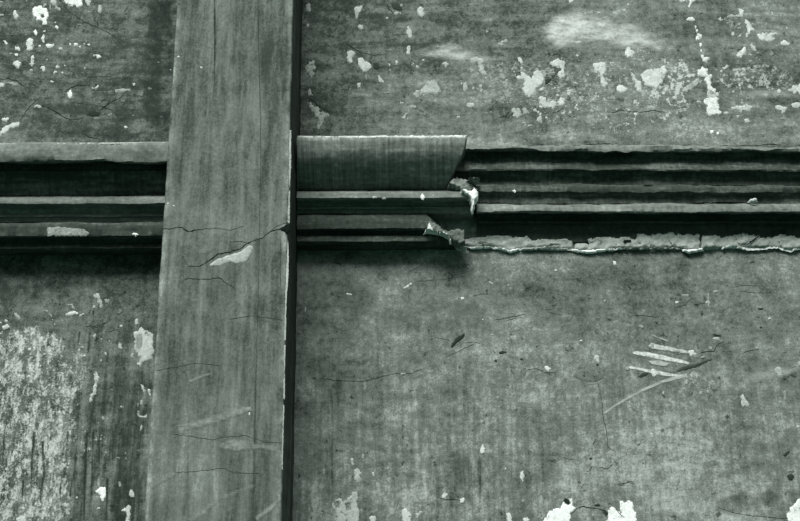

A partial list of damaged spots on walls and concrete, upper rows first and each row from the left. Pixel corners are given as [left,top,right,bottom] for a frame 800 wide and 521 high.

peeling [3,0,101,83]
crack [1,78,23,86]
crack [20,76,122,139]
crack [255,13,263,189]
peeling [503,57,578,127]
flaking render [447,177,480,214]
crack [161,210,288,292]
flaking render [424,221,800,254]
peeling [0,305,107,521]
crack [176,349,277,516]
peeling [544,498,576,521]
peeling [606,500,637,521]